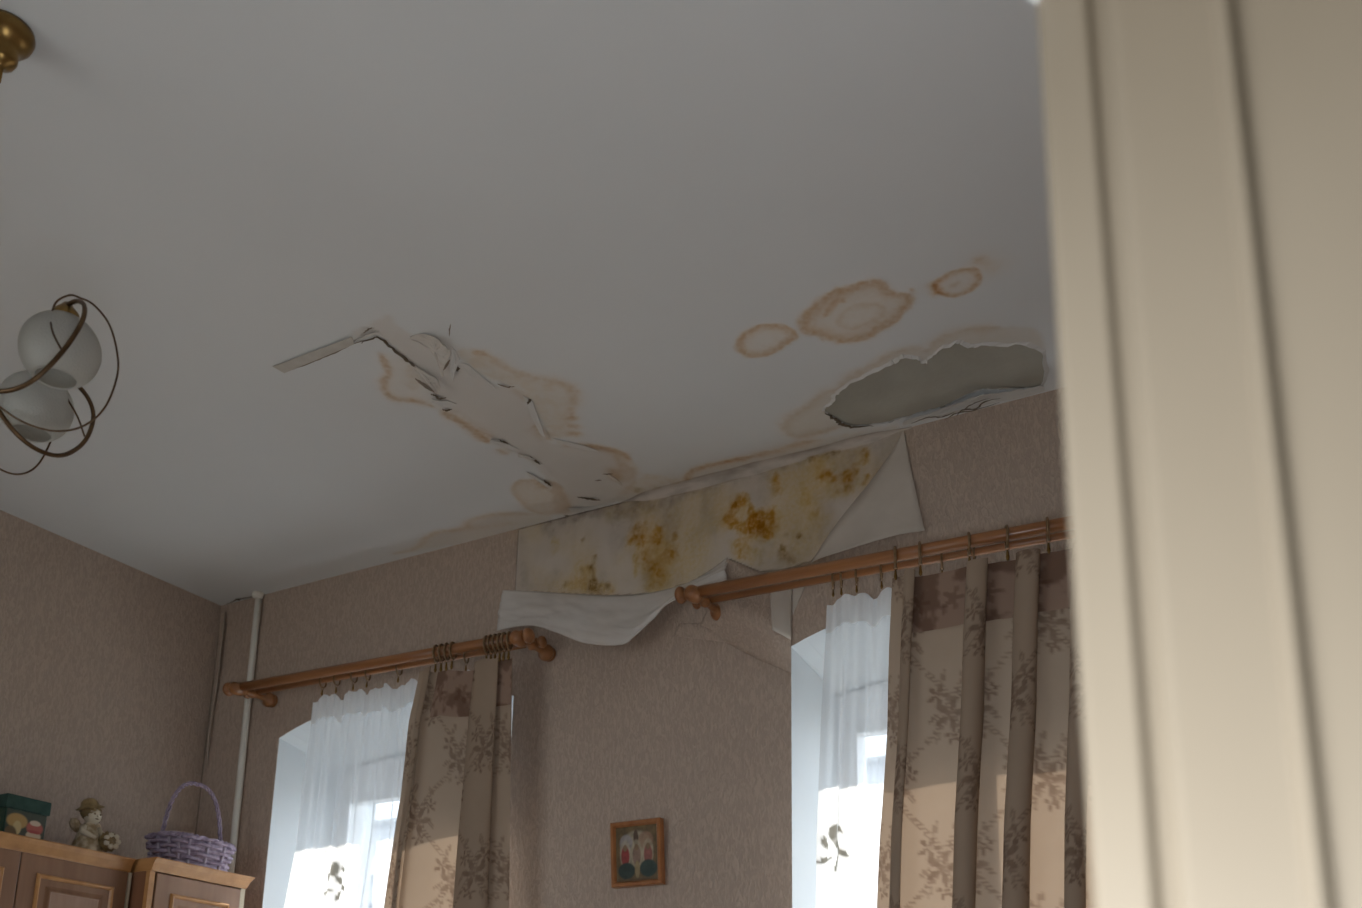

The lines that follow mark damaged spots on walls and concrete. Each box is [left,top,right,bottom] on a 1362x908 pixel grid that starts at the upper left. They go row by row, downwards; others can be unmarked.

peeling [273,324,597,451]
peeling [515,340,1049,595]